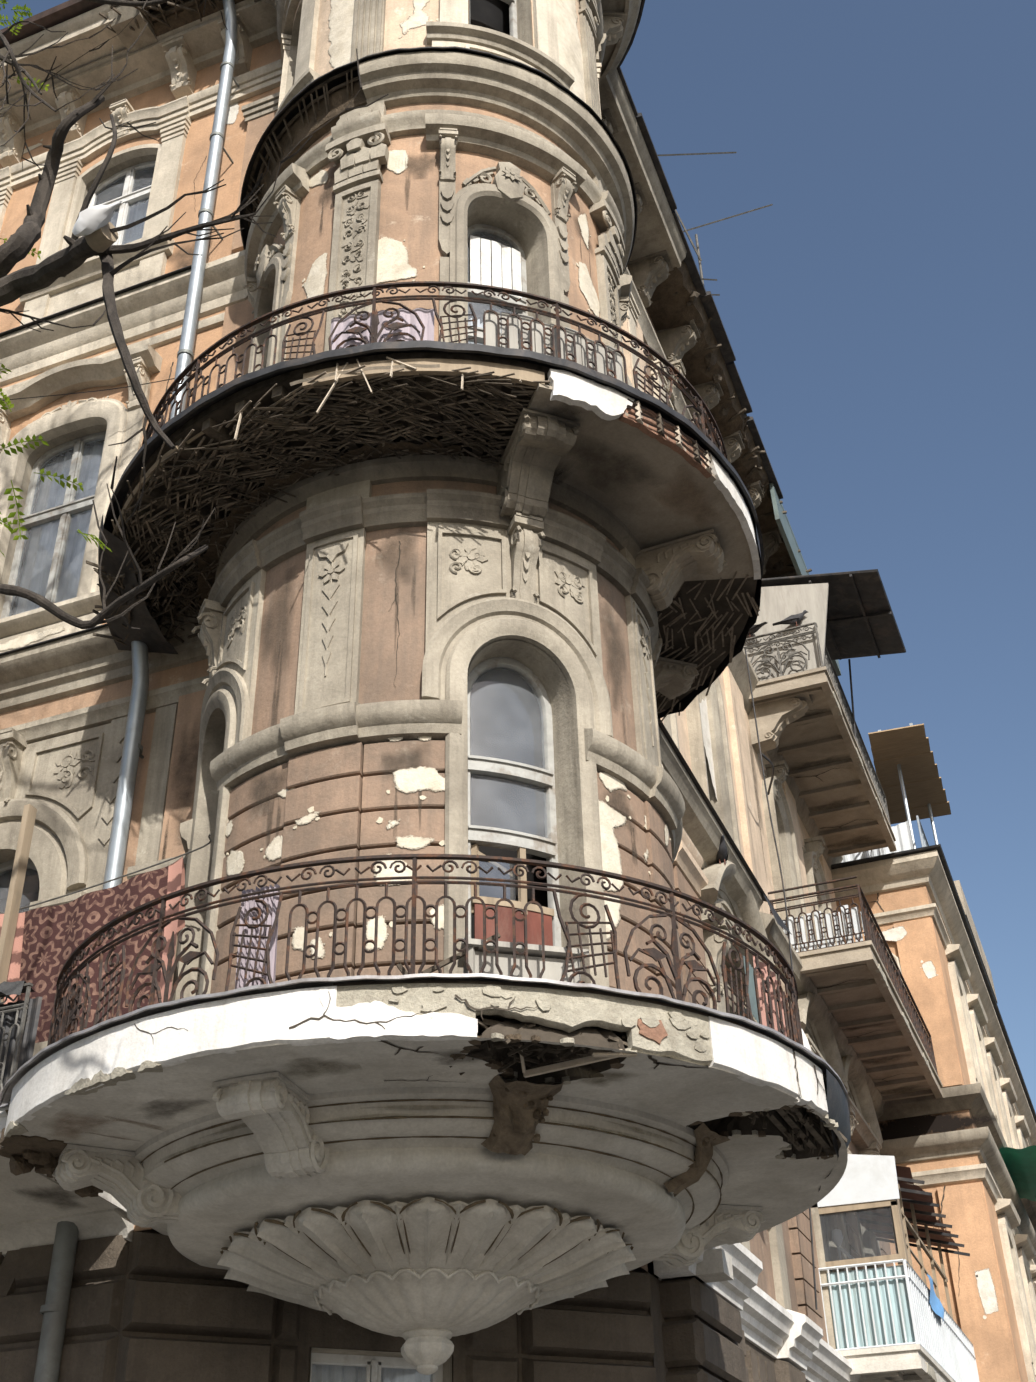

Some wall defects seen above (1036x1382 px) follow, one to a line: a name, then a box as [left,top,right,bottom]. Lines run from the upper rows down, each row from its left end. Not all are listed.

peeling [302,253,328,298]
peeling [376,236,425,284]
peeling [386,766,445,800]
peeling [225,806,320,876]
peeling [373,817,445,886]
peeling [598,772,647,942]
peeling [291,926,333,959]
peeling [365,915,393,951]
crack [289,991,438,1081]
crack [455,994,538,1019]
spalling [449,984,710,1085]
spalling [686,1104,847,1160]